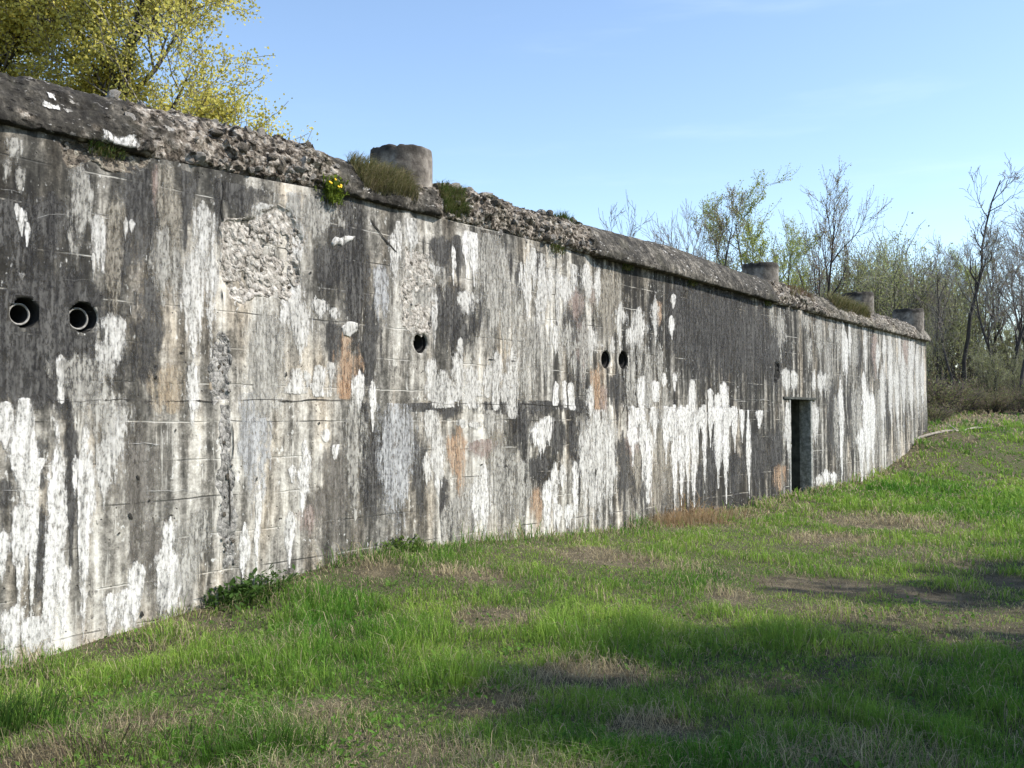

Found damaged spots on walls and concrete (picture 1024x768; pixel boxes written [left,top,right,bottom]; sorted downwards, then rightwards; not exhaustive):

spalling [219,203,312,305]
spalling [196,331,238,569]
corrosion [337,332,364,399]
damp [0,129,925,661]
corrosion [447,426,506,493]
corrosion [568,266,629,411]